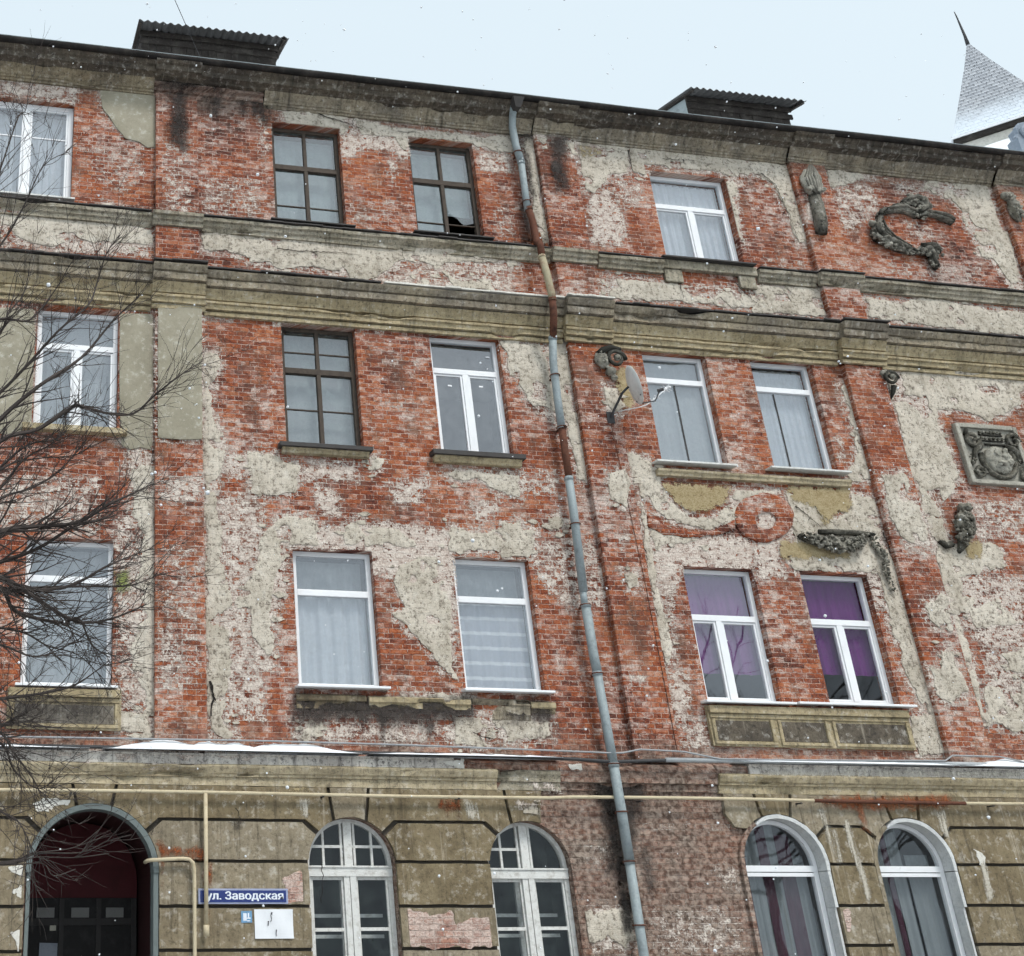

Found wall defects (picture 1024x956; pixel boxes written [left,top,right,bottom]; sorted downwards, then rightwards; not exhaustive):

damp [161,80,202,150]
flaking render [267,109,807,249]
flaking render [825,170,888,192]
flaking render [0,209,155,251]
flaking render [920,181,1024,290]
flaking render [596,271,827,318]
flaking render [202,346,570,769]
flaking render [597,371,1024,760]
crack [208,681,216,716]
flaking render [407,909,492,950]